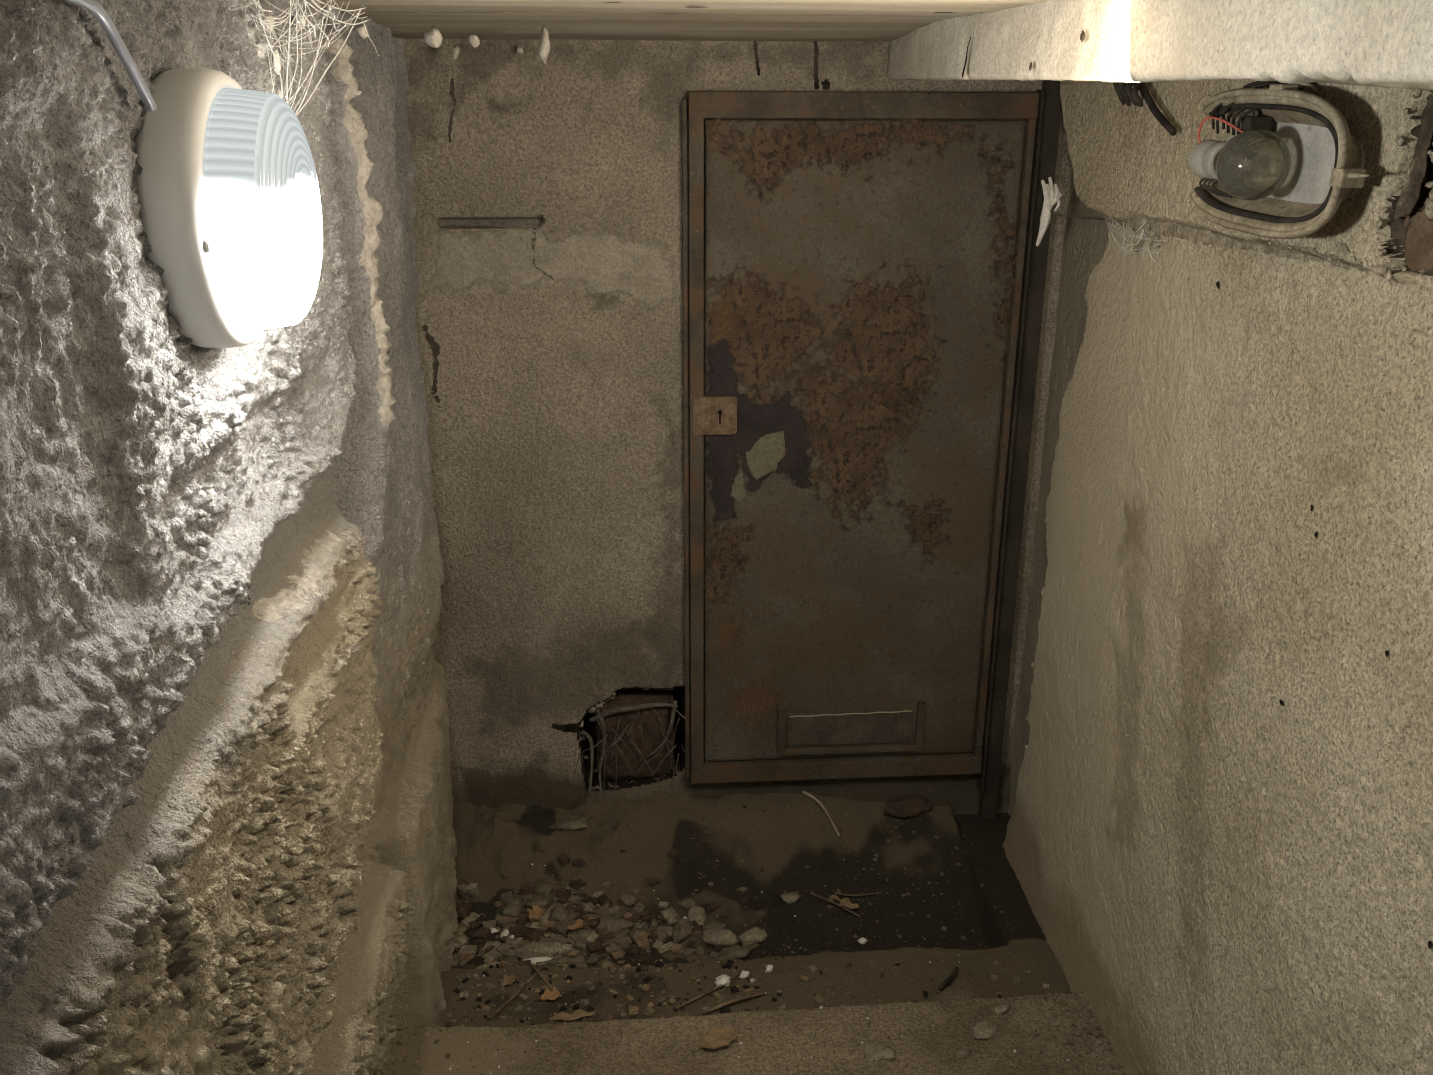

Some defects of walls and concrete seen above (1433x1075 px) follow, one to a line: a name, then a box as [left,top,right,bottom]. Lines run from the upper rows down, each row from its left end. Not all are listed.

corrosion [708,118,1017,363]
spalling [1105,88,1433,281]
corrosion [883,497,951,564]
spalling [577,684,685,791]